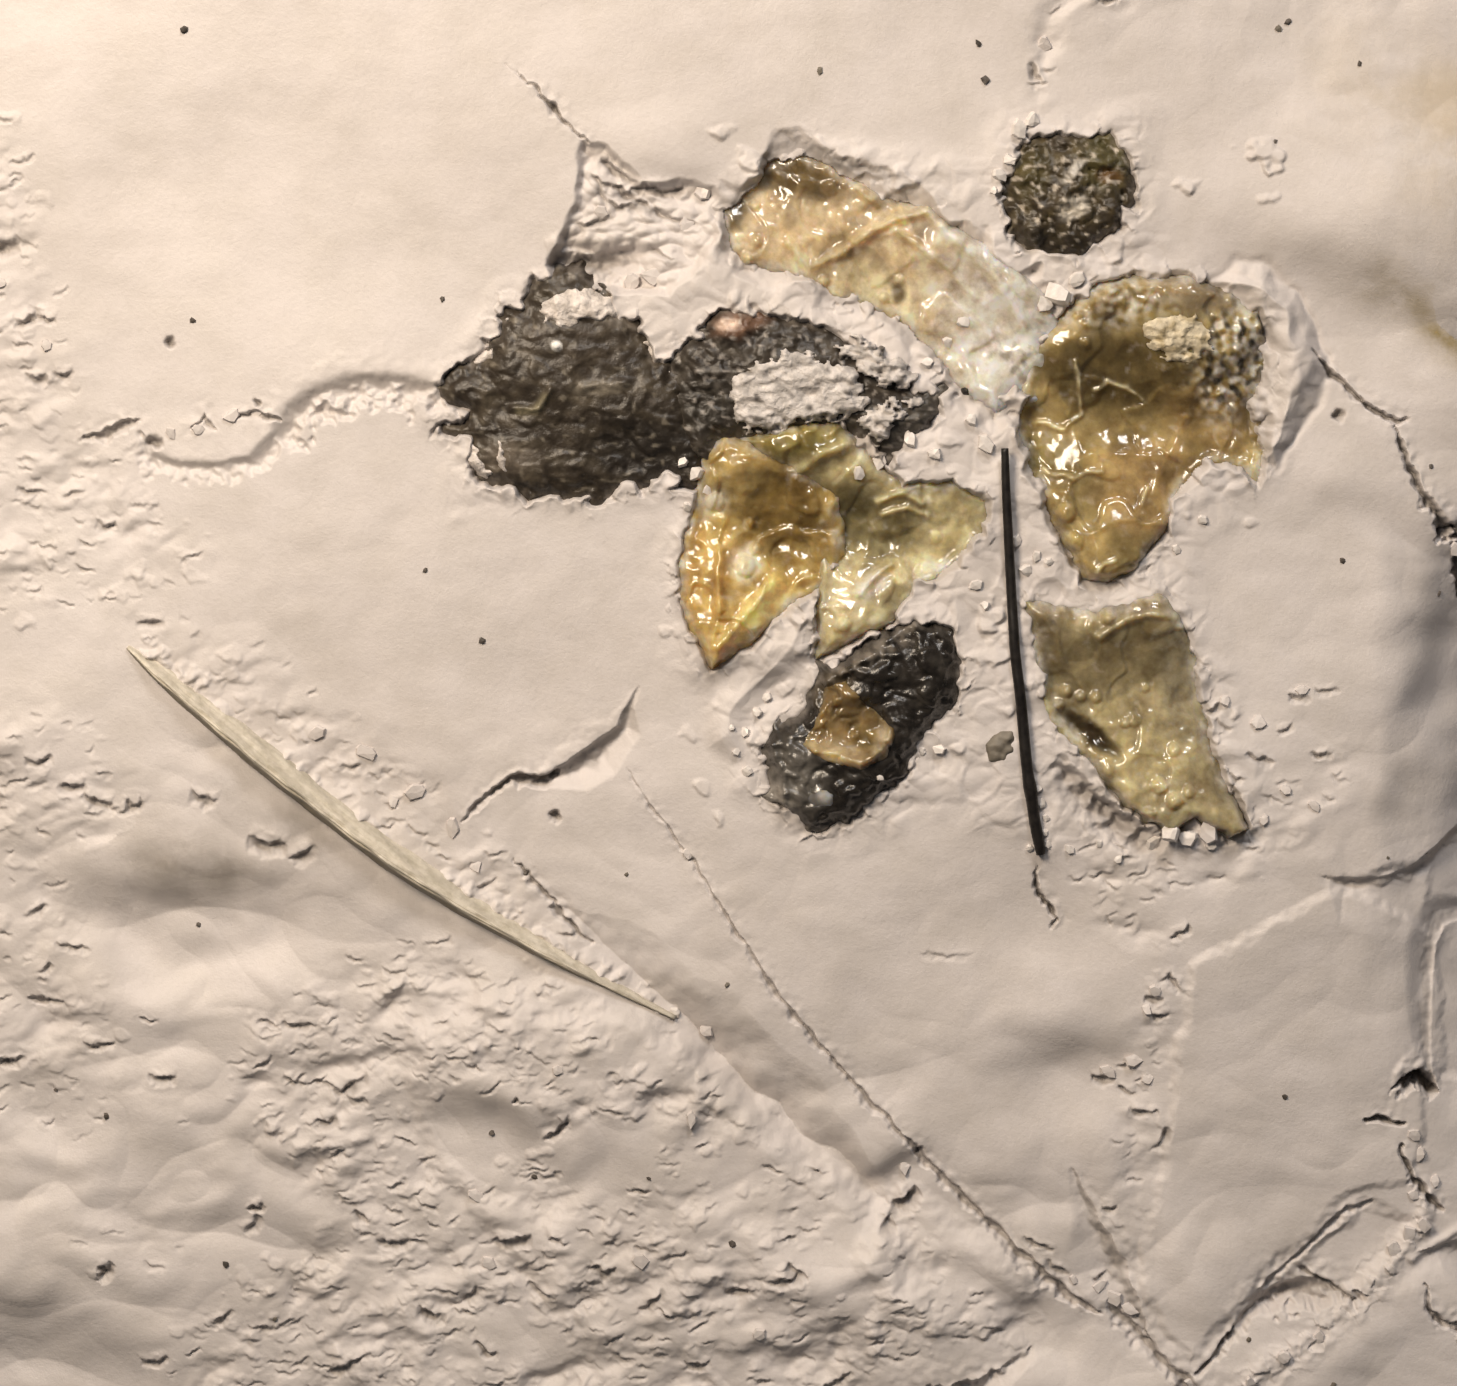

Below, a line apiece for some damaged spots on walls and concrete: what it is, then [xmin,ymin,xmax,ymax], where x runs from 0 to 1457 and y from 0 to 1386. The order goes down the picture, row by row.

spalling [0,90,599,958]
crack [517,73,589,142]
peeling [539,273,640,327]
crack [1311,349,1457,598]
spalling [0,698,1055,1386]
crack [461,687,1457,1386]
spalling [1079,746,1361,1233]